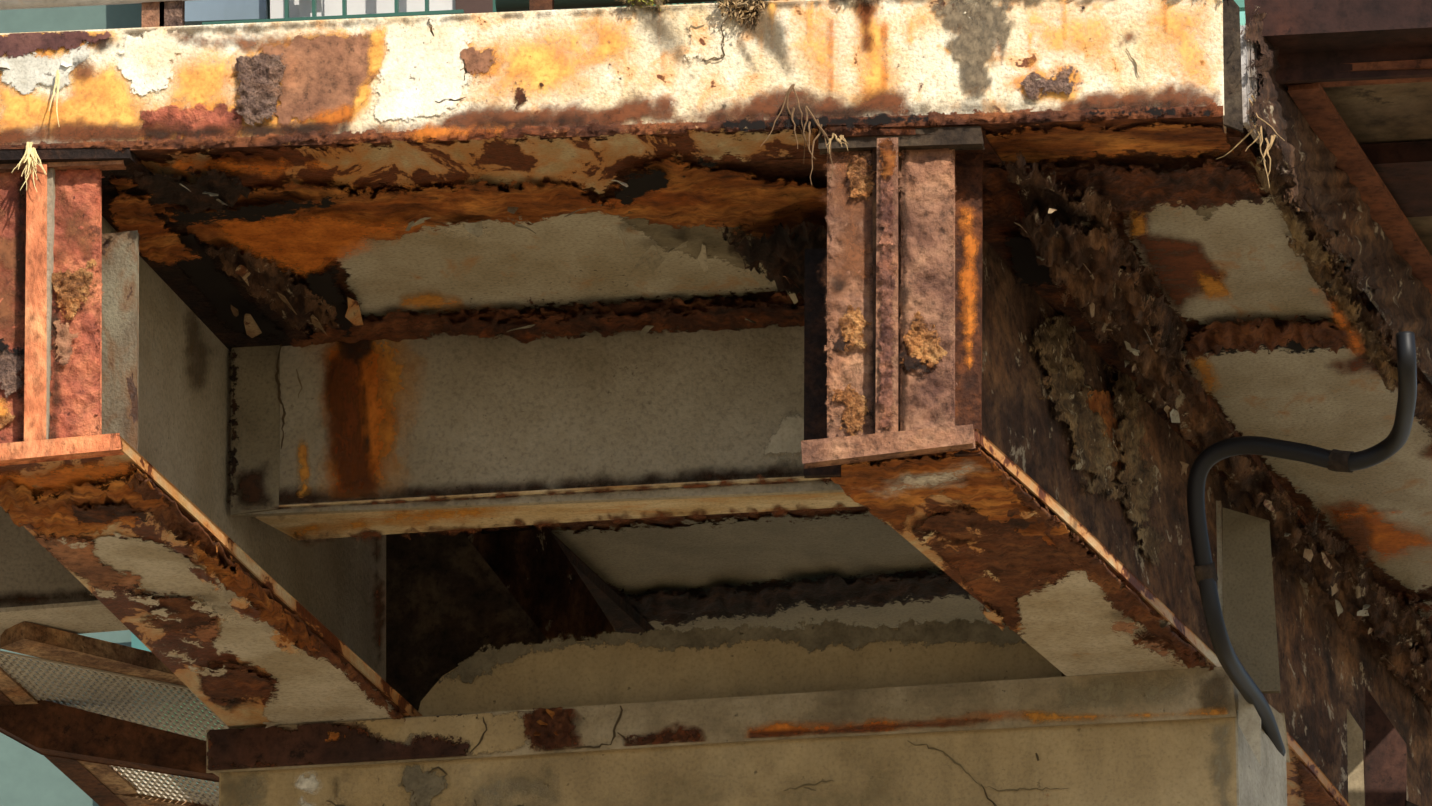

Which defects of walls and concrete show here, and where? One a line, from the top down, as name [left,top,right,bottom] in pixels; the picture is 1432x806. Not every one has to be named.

peeling [258,28,386,126]
rust [0,0,1219,175]
water stain [999,30,1009,55]
rust [0,172,27,443]
rust [824,151,875,438]
rust [898,148,977,431]
peeling [35,530,303,711]
rust [237,340,1207,668]
peeling [908,501,1099,631]
peeling [1027,302,1166,566]
spalling [206,711,535,806]
crack [908,741,1068,806]